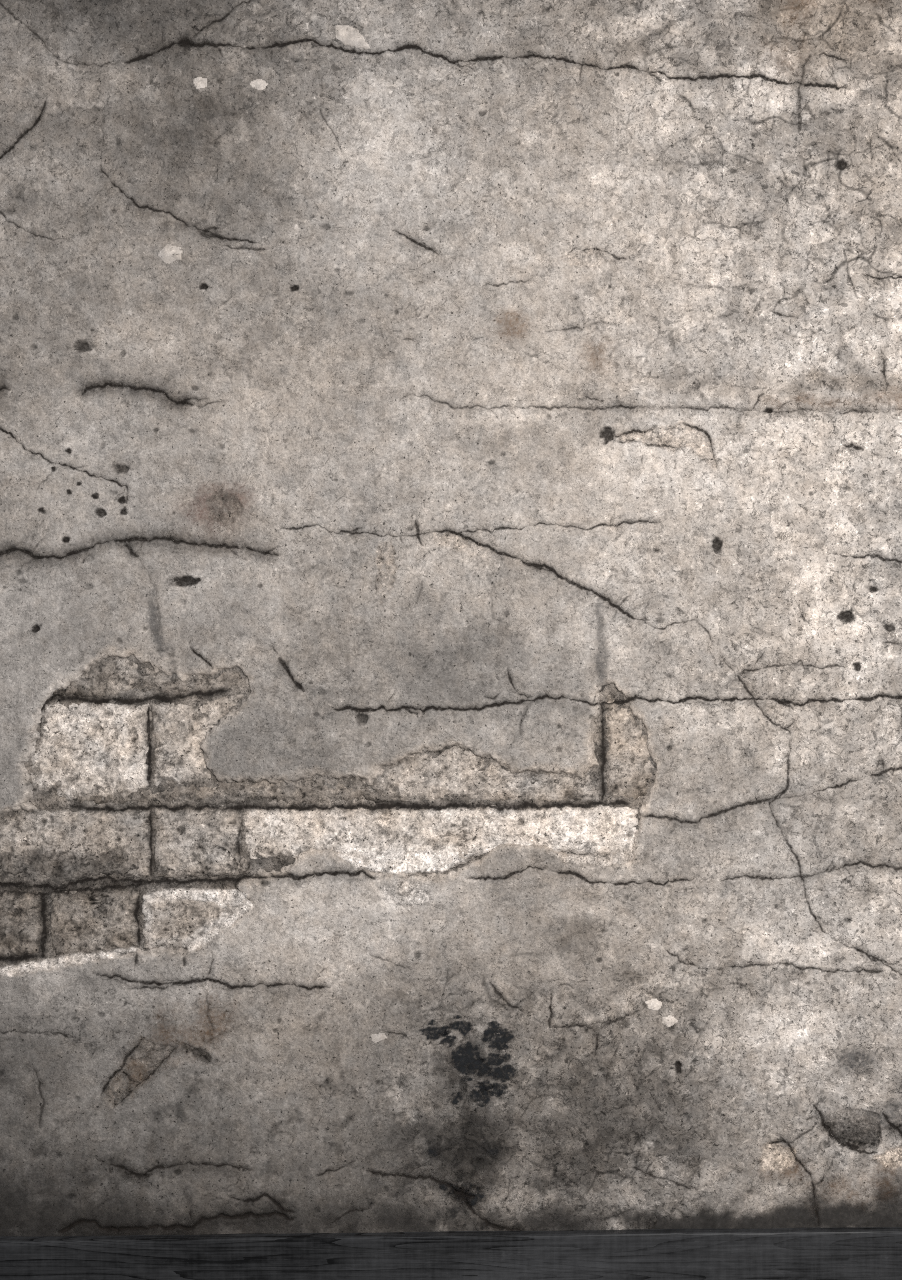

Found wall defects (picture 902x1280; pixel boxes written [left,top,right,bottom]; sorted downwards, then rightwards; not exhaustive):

crack [84,0,845,129]
crack [82,382,212,405]
crack [425,394,810,457]
crack [0,428,709,634]
crack [841,554,902,563]
crack [274,649,305,692]
spalling [0,654,656,977]
crack [334,656,902,975]
crack [0,847,375,896]
crack [97,954,325,990]
damp [419,1015,516,1107]
damp [623,1180,902,1229]